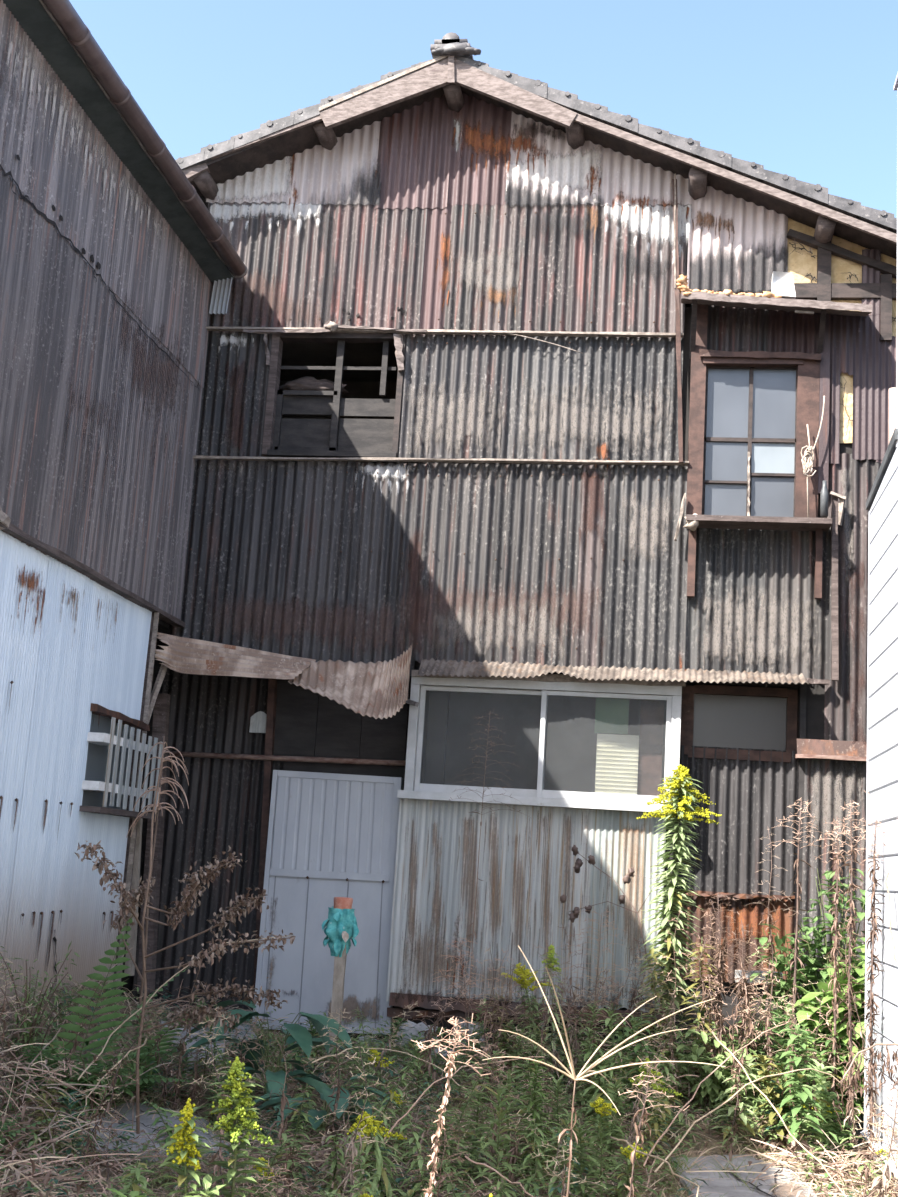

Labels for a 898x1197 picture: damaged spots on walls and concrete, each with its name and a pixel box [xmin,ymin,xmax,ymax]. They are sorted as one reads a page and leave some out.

rust [453,120,561,175]
leakage [529,211,597,248]
rust [11,566,45,634]
rust [389,814,667,1027]
rust [674,892,795,962]